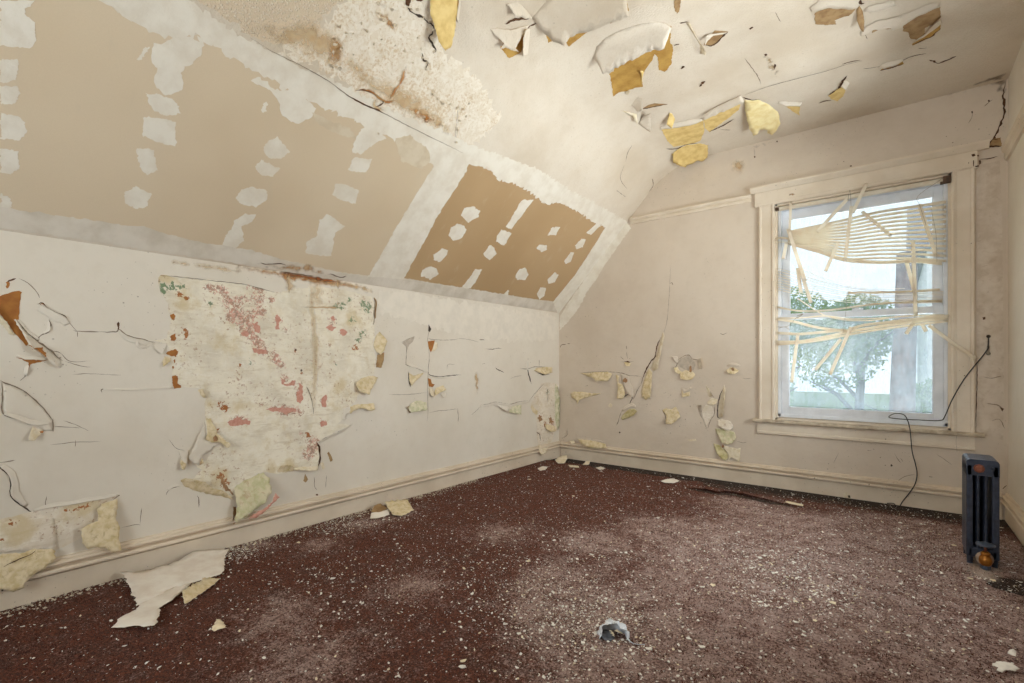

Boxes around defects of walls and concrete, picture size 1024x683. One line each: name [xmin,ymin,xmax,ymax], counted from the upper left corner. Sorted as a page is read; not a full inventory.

leakage [287,29,341,61]
flaking render [278,0,502,145]
spalling [810,0,860,25]
spalling [899,2,942,45]
crack [969,86,1006,147]
crack [6,278,155,375]
peeling [152,275,387,525]
peeling [403,336,447,413]
peeling [474,333,702,455]
peeling [698,386,746,462]
crack [0,460,31,512]
peeling [0,494,142,592]